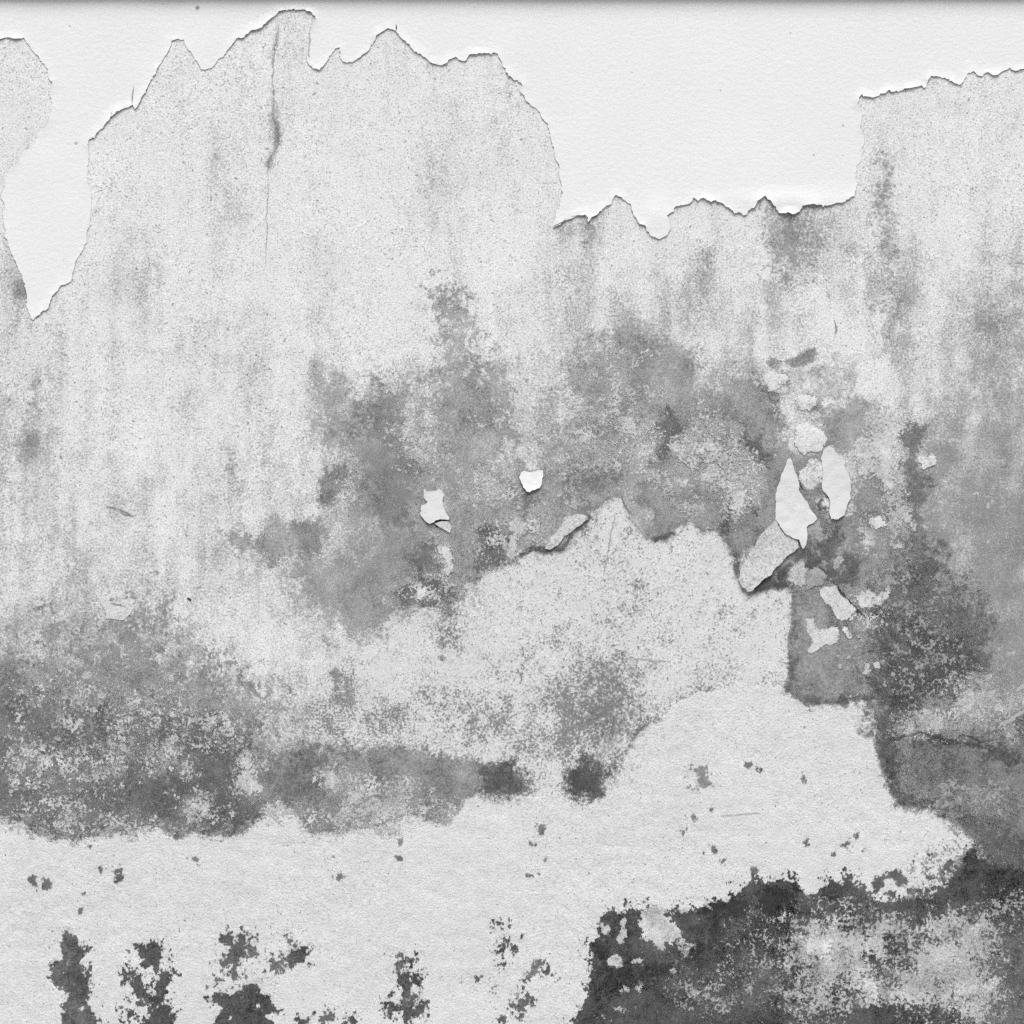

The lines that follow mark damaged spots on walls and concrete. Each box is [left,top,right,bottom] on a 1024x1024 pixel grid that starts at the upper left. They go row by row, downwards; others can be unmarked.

peeling [0,0,1024,369]
damp [0,571,530,846]
flaking render [0,458,1024,1024]
damp [219,269,1024,1024]
peeling [821,446,851,519]